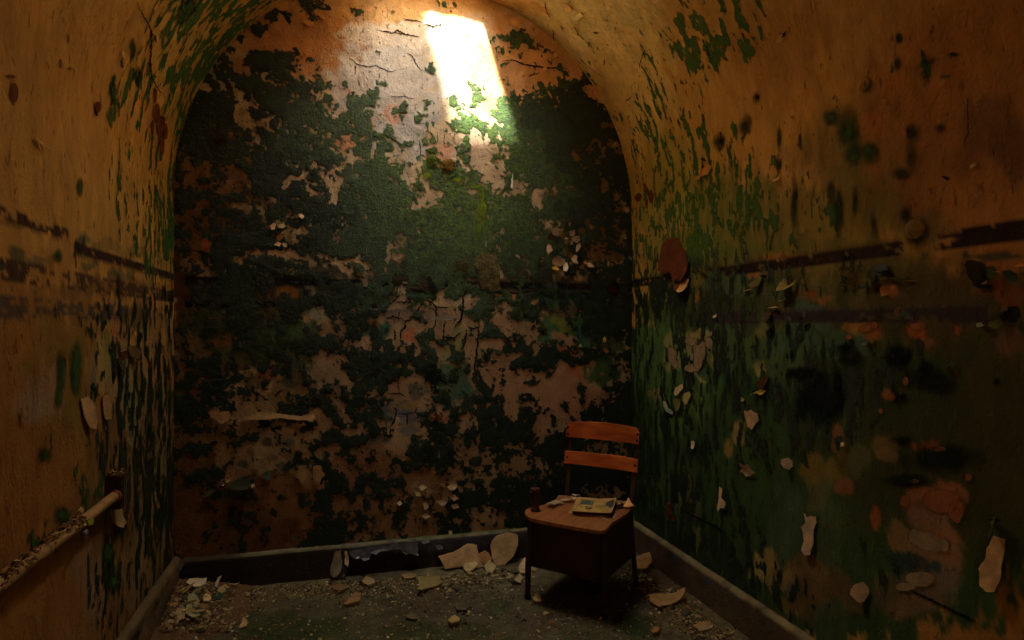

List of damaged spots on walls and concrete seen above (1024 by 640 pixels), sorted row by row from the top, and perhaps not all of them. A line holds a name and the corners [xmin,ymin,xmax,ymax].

crack [349,18,442,115]
crack [504,59,567,77]
peeling [547,230,594,271]
crack [385,288,589,373]
peeling [244,412,315,421]
crack [388,376,418,439]
peeling [663,384,691,414]
peeling [741,375,770,430]
peeling [330,539,443,580]
peeling [801,514,817,556]
peeling [978,516,1005,592]
peeling [624,552,736,640]